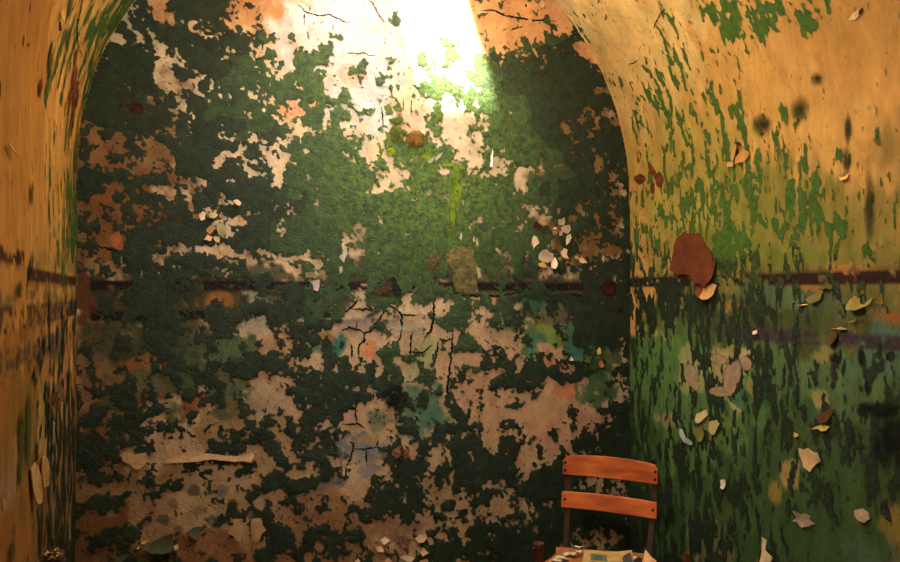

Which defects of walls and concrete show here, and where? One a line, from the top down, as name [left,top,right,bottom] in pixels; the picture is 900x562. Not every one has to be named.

crack [297,3,354,24]
crack [481,9,557,31]
peeling [199,211,226,243]
peeling [532,217,587,269]
peeling [670,232,716,300]
crack [340,289,581,395]
peeling [686,354,752,397]
peeling [165,452,255,464]
crack [342,402,380,481]
peeling [679,410,720,445]
peeling [798,448,821,472]
peeling [760,537,773,562]